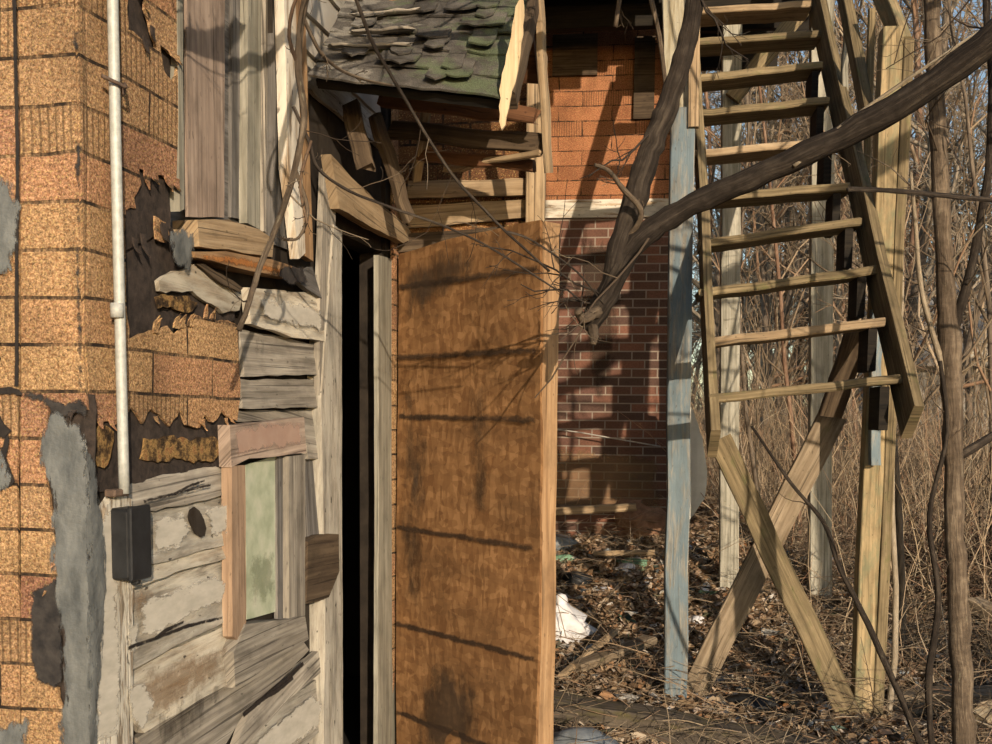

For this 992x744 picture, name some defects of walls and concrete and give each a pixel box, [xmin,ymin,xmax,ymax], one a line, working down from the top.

peeling [132,216,170,257]
peeling [152,304,217,334]